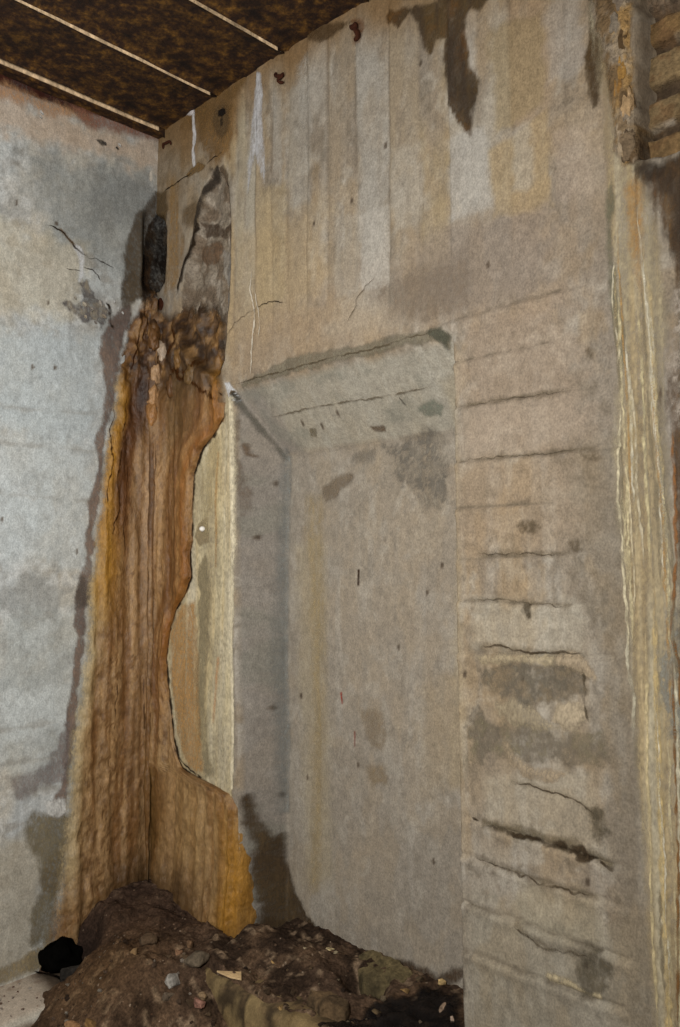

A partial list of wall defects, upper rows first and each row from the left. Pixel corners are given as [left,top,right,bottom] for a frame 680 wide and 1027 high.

leakage [387,0,485,131]
crack [49,225,111,282]
peeling [63,280,124,325]
spalling [142,165,231,375]
leakage [584,2,680,1027]
leakage [0,192,157,983]
leakage [167,275,450,928]
crack [479,859,585,895]
crack [473,817,612,868]
crack [519,783,590,811]